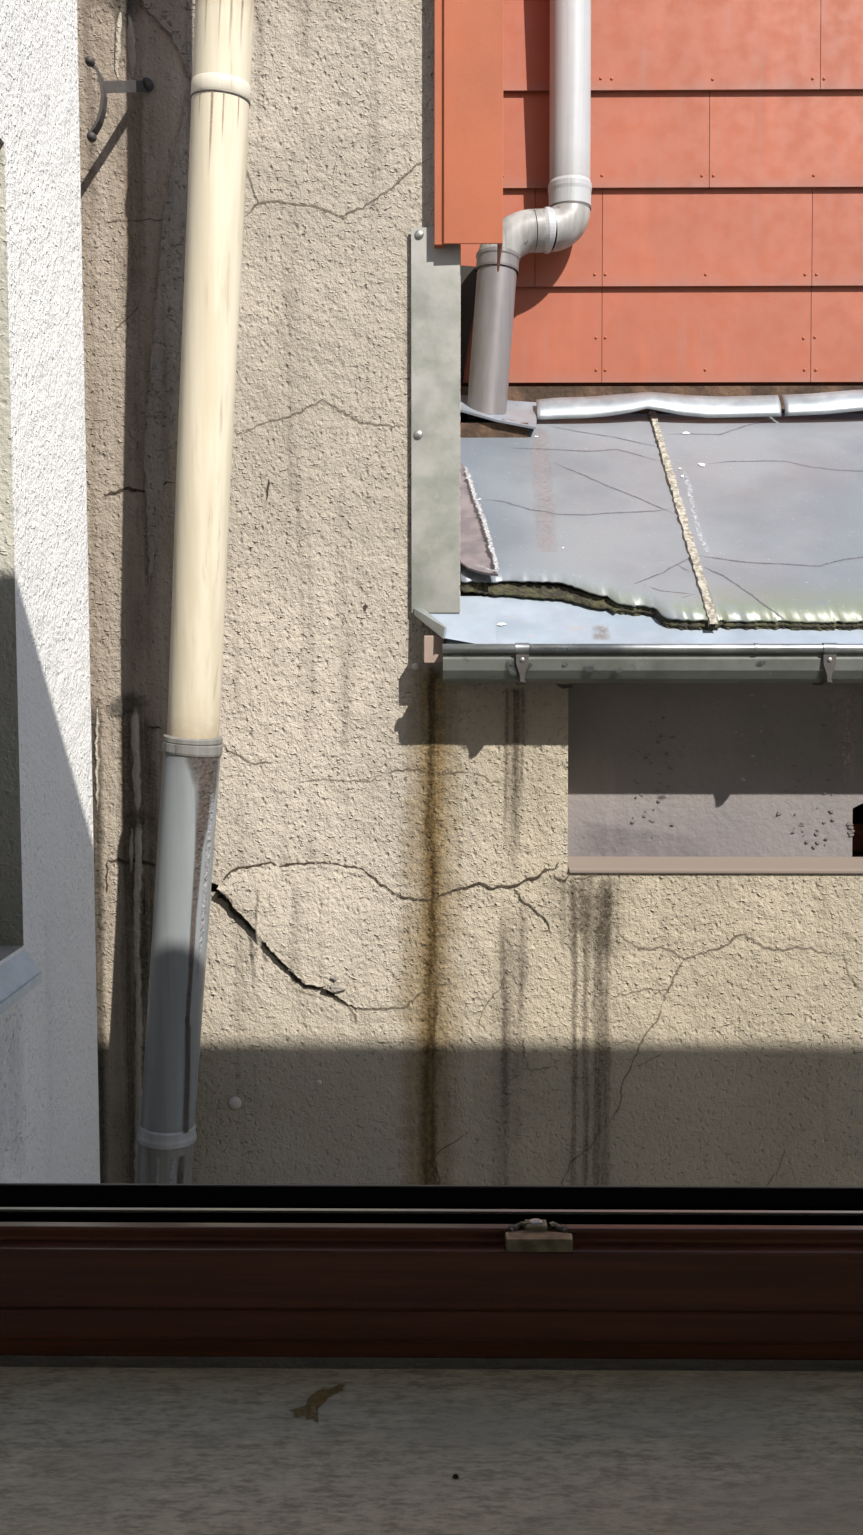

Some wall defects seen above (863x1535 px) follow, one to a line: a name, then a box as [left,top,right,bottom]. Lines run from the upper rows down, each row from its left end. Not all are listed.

damp [114,0,136,78]
crack [246,160,426,217]
crack [239,399,405,433]
damp [91,695,153,1184]
crack [221,861,601,1031]
damp [571,877,614,1186]
crack [561,931,863,1185]